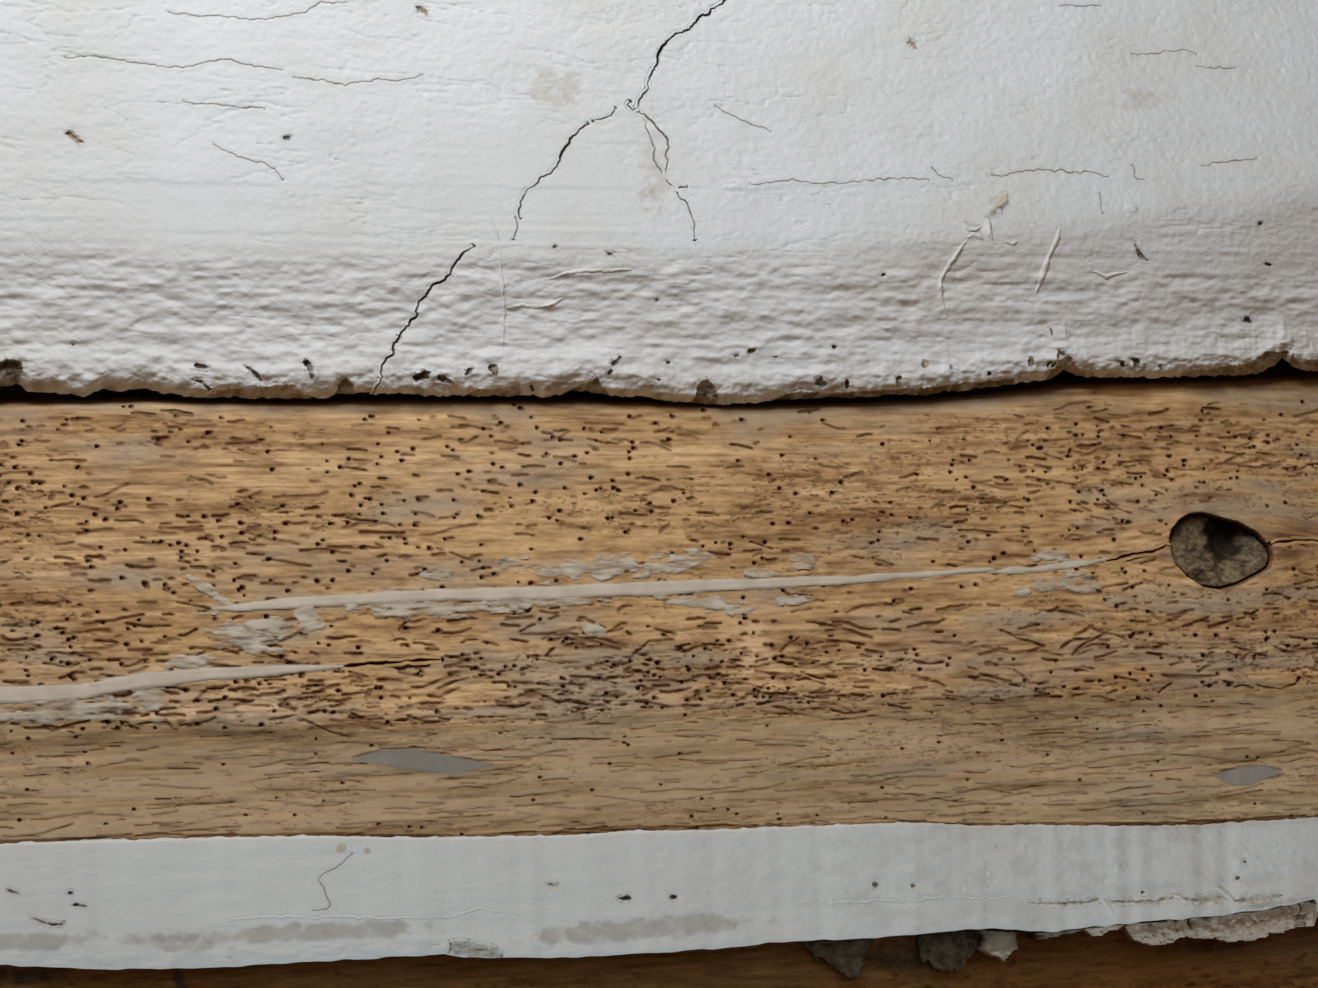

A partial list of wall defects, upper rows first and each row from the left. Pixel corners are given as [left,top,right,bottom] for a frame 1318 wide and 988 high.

crack [511,0,730,240]
crack [714,104,771,134]
crack [369,244,475,395]
spalling [0,356,25,387]
spalling [189,357,359,399]
spalling [411,360,536,397]
spalling [557,351,624,396]
spalling [690,375,721,404]
spalling [731,345,780,361]
spalling [761,326,1098,402]
spalling [1115,355,1143,372]
spalling [1177,350,1318,377]